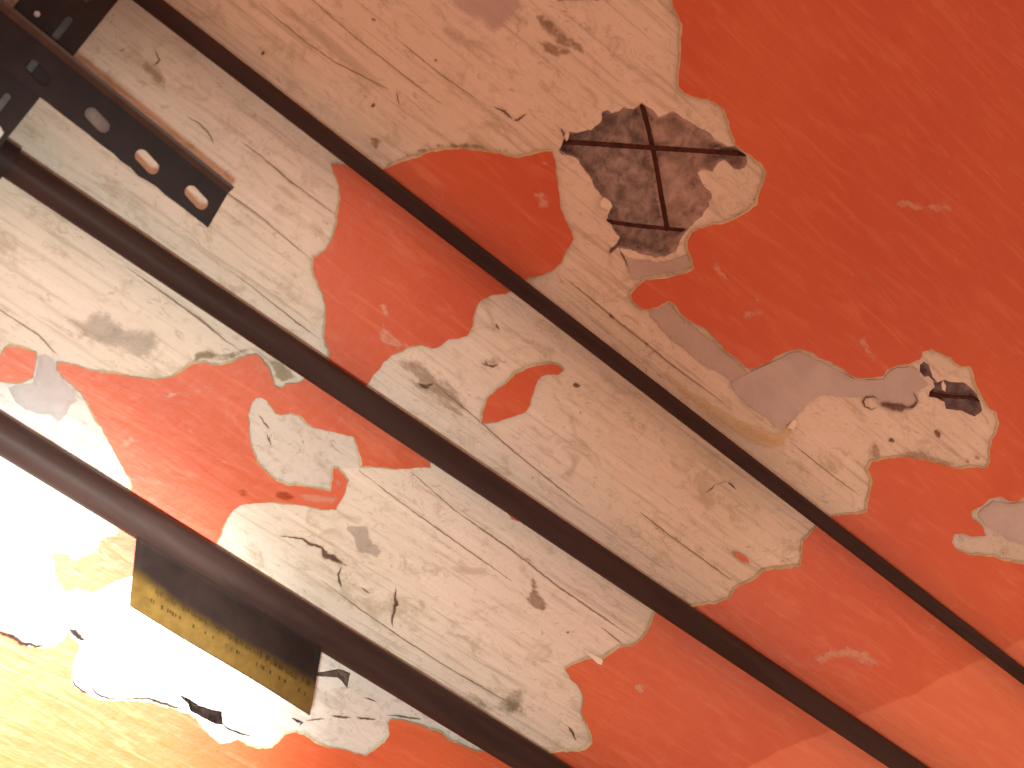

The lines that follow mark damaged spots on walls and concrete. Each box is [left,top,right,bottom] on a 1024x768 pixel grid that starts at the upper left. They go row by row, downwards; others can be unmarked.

peeling [0,177,305,492]
peeling [7,0,346,360]
peeling [0,457,485,756]
crack [282,536,369,593]
peeling [216,398,657,754]
peeling [164,0,999,517]
peeling [367,292,817,607]
peeling [952,497,1024,565]